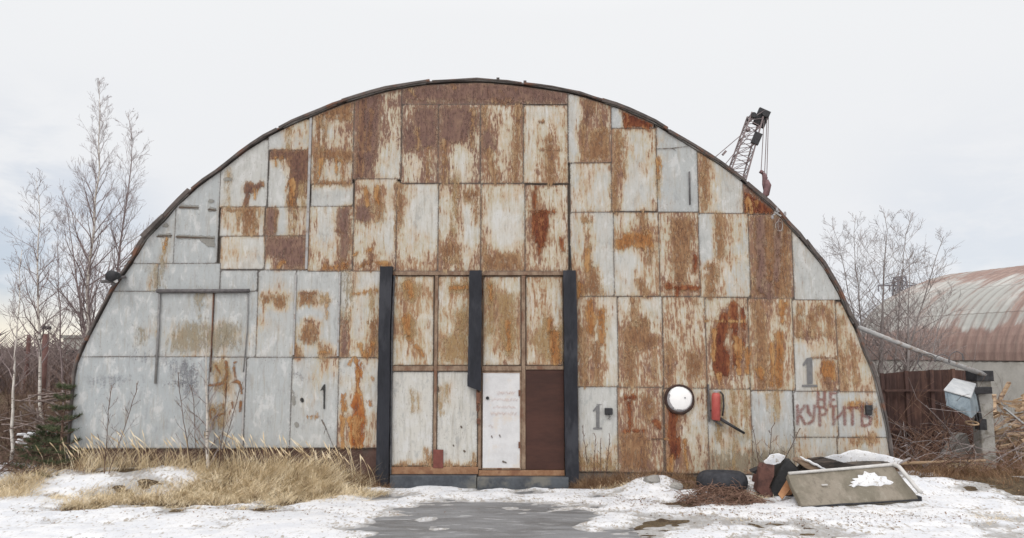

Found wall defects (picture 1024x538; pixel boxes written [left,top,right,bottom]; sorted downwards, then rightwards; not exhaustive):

corrosion [223,95,404,272]
corrosion [401,84,566,365]
corrosion [580,98,595,160]
corrosion [664,157,725,306]
corrosion [260,288,378,449]
corrosion [615,193,858,473]